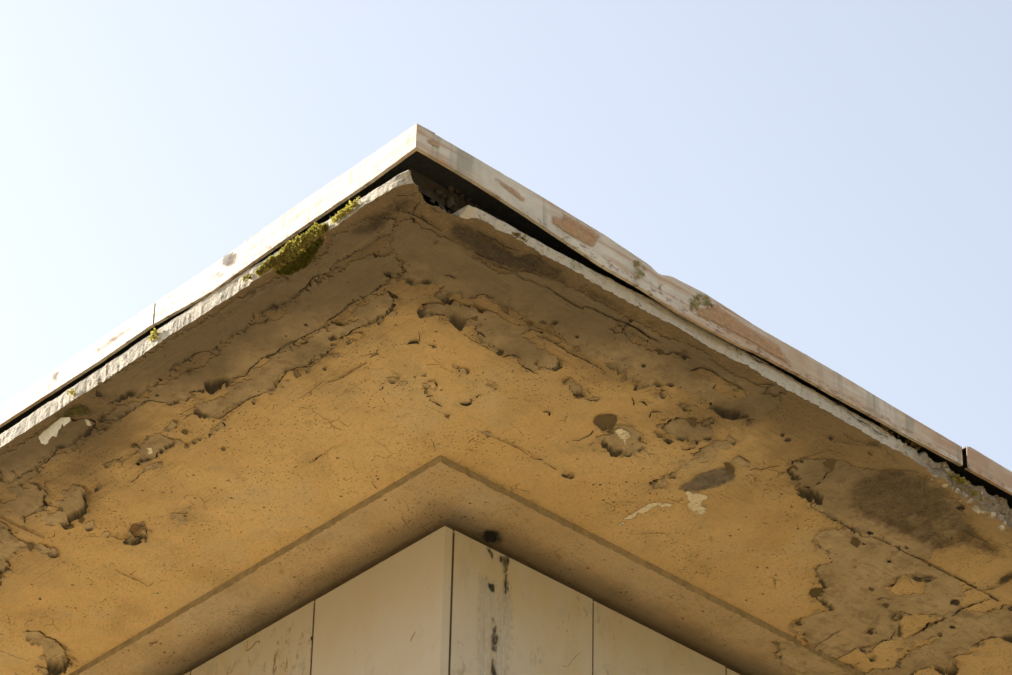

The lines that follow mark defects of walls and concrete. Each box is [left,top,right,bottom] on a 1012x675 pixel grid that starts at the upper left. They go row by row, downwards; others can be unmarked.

crack [394,195,442,231]
crack [299,353,379,399]
peeling [0,215,789,586]
crack [500,307,603,371]
leakage [853,472,995,551]
leakage [480,531,509,675]
peeling [772,457,1012,675]
peeling [22,630,76,675]